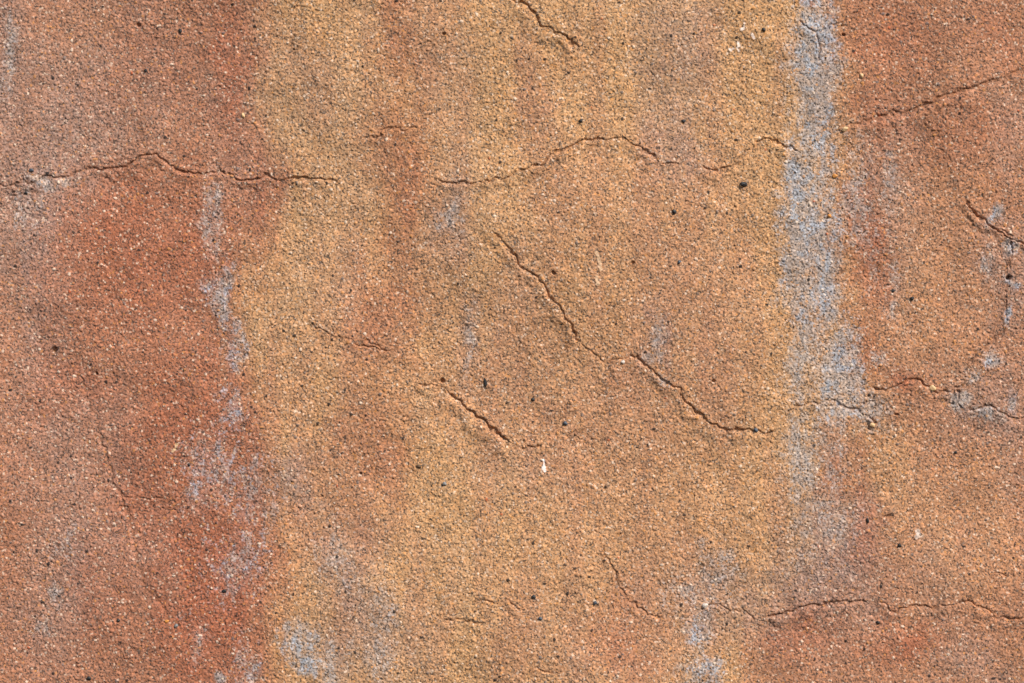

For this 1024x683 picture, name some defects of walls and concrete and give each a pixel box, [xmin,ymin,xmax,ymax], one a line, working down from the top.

crack [511,0,581,49]
crack [0,152,338,188]
crack [437,135,801,187]
crack [446,199,1024,457]
crack [415,382,547,452]
crack [601,545,1024,622]